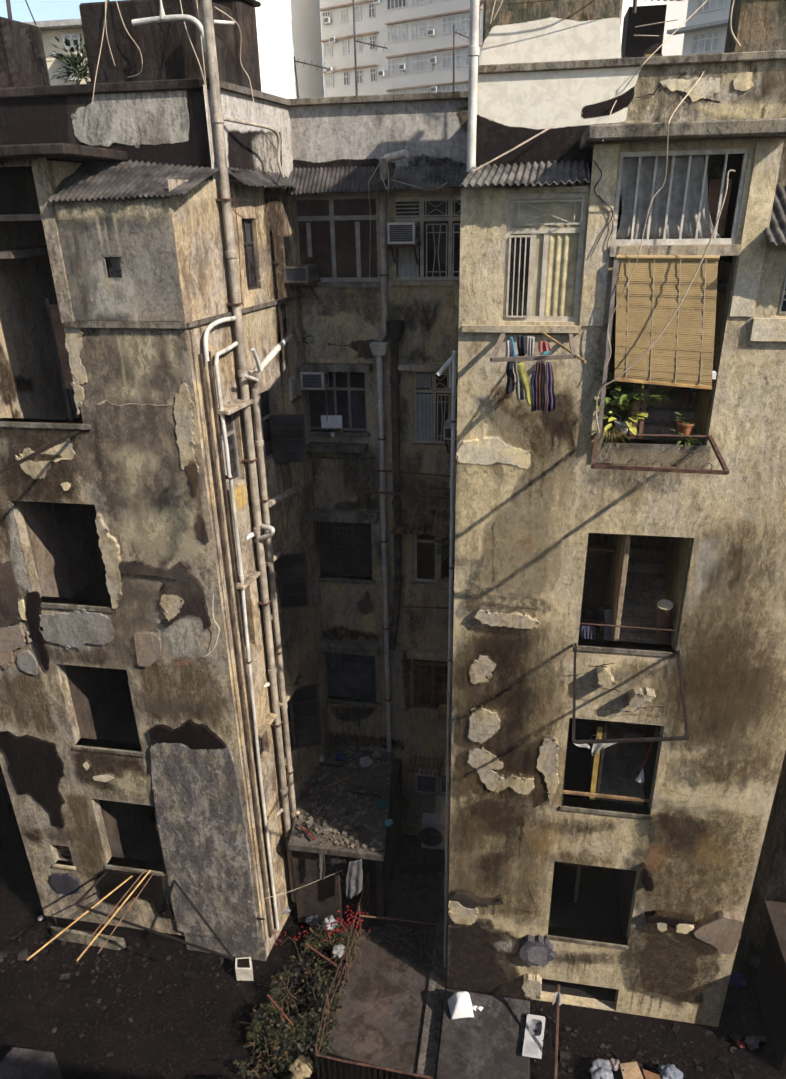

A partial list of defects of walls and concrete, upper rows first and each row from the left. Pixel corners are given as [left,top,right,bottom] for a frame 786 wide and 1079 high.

peeling [71,90,190,148]
peeling [15,439,76,479]
peeling [64,328,88,415]
leakage [0,179,213,592]
leakage [402,453,523,558]
leakage [492,384,578,460]
spalling [0,560,50,671]
spalling [95,511,211,630]
spalling [0,731,65,828]
spalling [148,719,227,751]
peeling [467,704,560,805]
leakage [624,518,786,1011]